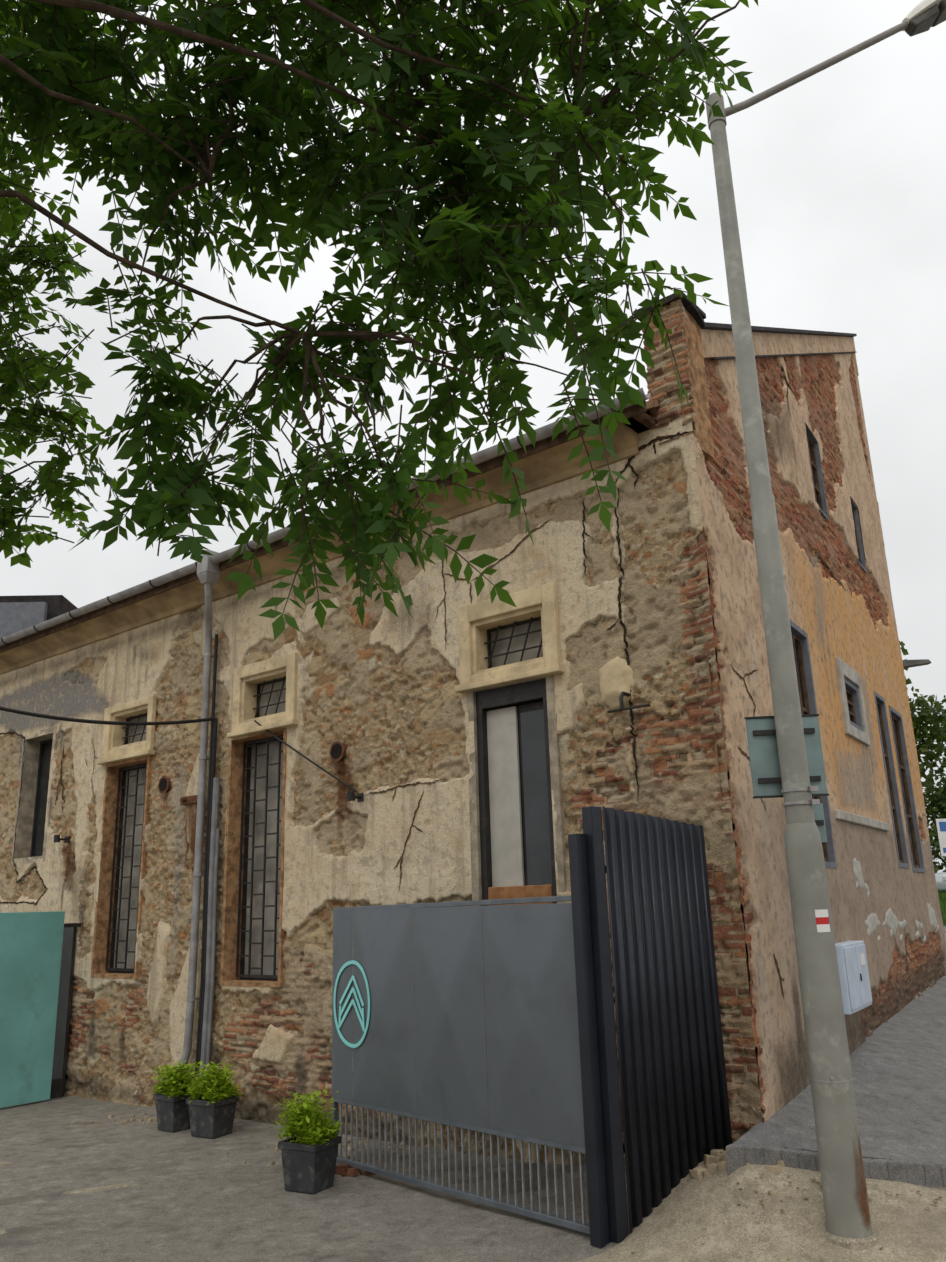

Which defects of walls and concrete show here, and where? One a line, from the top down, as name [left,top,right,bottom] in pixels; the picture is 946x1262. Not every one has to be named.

flaking render [755,354,888,627]
crack [435,431,693,801]
flaking render [0,731,46,905]
flaking render [50,729,97,961]
crack [366,779,446,890]
flaking render [64,314,766,1165]
flaking render [853,858,945,1038]